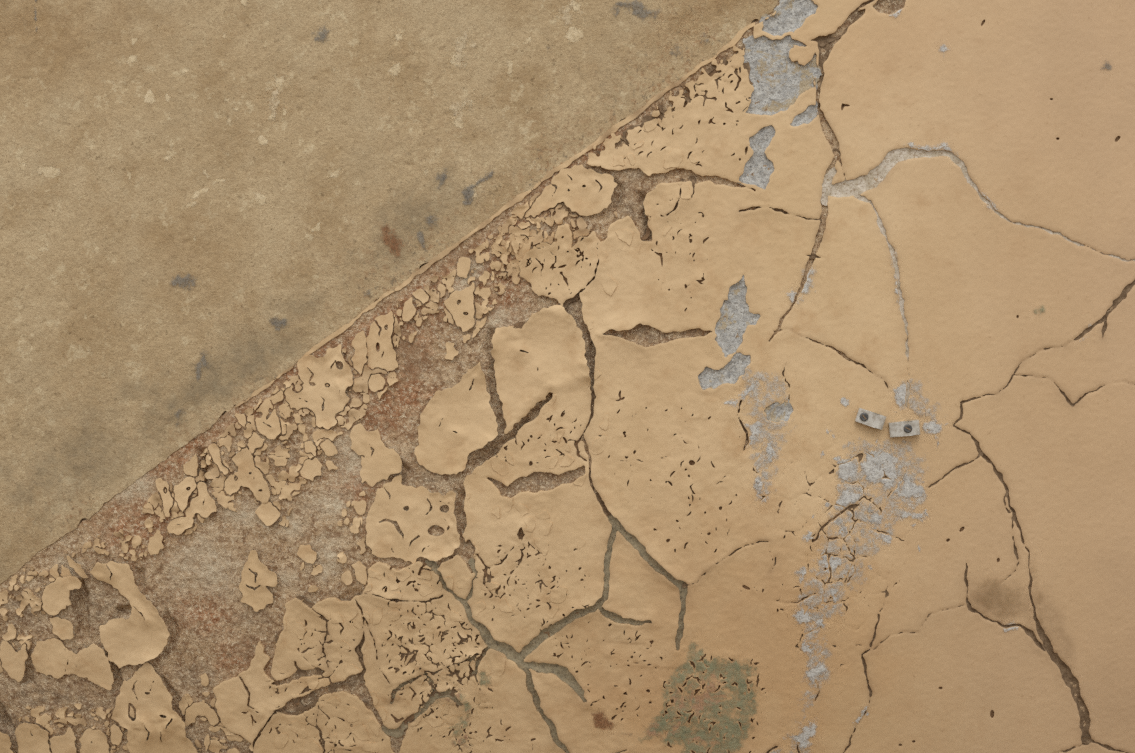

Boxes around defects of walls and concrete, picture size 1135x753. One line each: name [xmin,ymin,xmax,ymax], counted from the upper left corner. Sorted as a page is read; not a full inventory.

flaking render [0,0,822,753]
crack [237,0,1135,753]
mould [645,644,756,753]